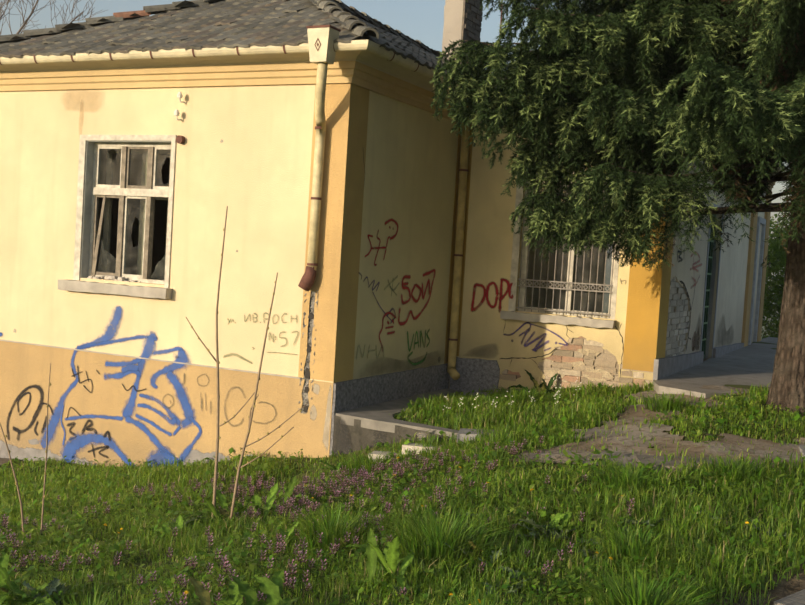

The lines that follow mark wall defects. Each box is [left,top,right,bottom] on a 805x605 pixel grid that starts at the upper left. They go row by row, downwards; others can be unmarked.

spalling [665,276,701,357]
spalling [536,336,653,392]